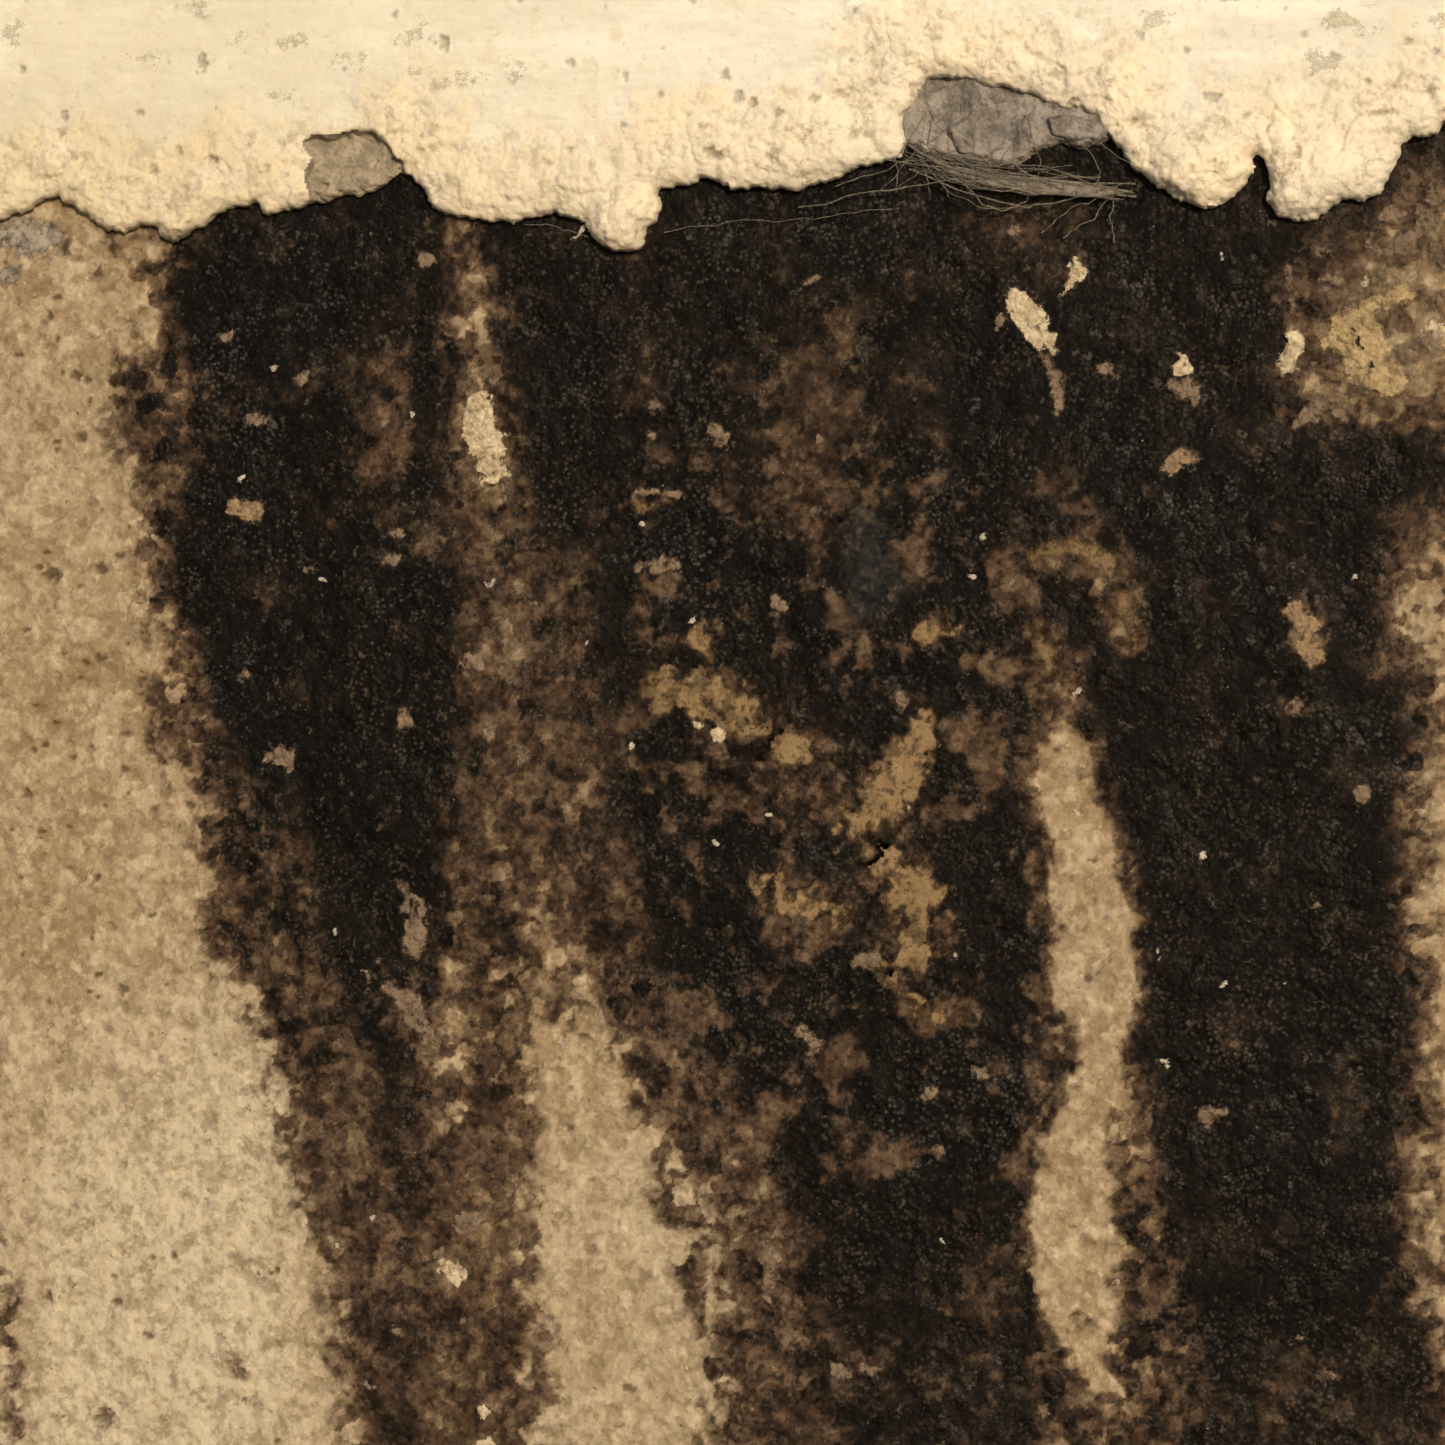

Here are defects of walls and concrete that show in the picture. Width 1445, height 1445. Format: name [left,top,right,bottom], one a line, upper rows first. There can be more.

spalling [902,77,1111,169]
spalling [302,129,406,204]
leakage [1006,288,1057,355]
leakage [1375,286,1432,341]
leakage [1167,352,1201,407]
leakage [458,377,512,502]
leakage [1327,381,1445,550]
leakage [848,509,894,626]
leakage [710,726,726,743]
leakage [432,1247,467,1287]
leakage [0,1270,25,1445]
leakage [475,1436,496,1445]